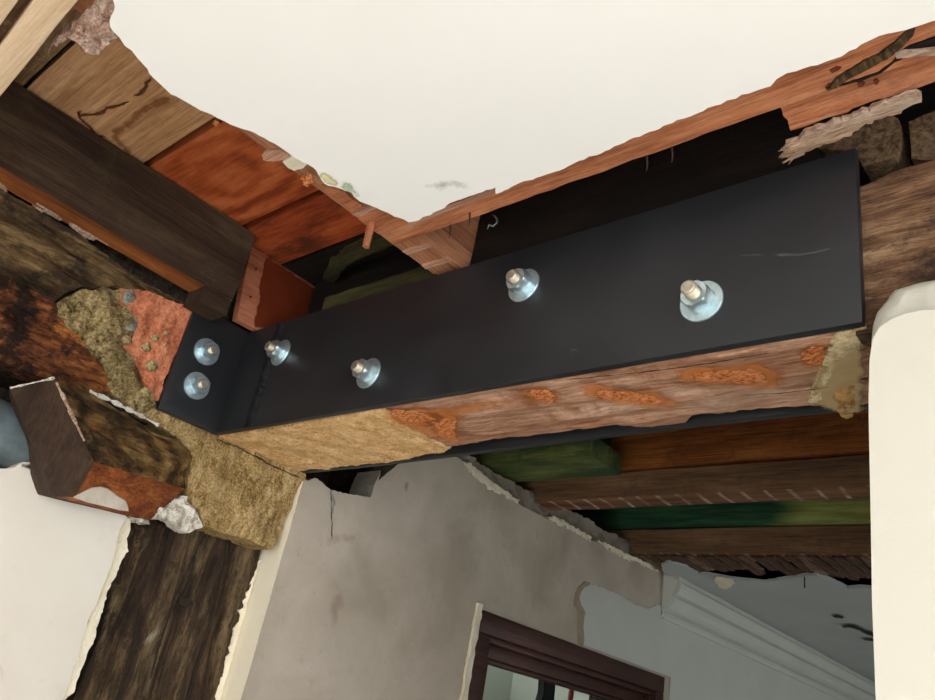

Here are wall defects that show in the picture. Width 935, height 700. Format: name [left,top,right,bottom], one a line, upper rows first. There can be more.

flaking render [116,288,192,402]
peeling [689,368,770,386]
peeling [391,409,457,438]
crack [329,491,337,536]
flaking render [457,455,659,572]
flaking render [714,576,735,589]